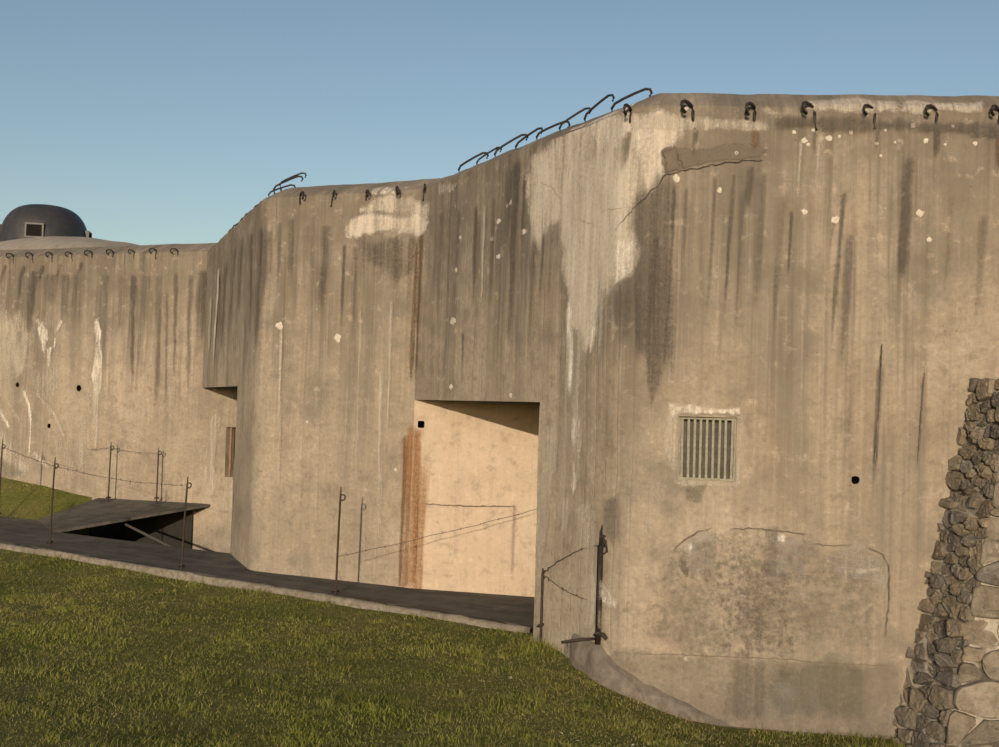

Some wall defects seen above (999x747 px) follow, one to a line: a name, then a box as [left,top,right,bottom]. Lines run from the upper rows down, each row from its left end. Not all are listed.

water stain [473,204,494,296]
peeling [522,103,766,467]
crack [541,126,762,234]
water stain [833,194,852,322]
water stain [777,99,999,158]
water stain [899,159,913,270]
water stain [0,392,42,474]
water stain [92,320,102,446]
corrosion [399,428,425,589]